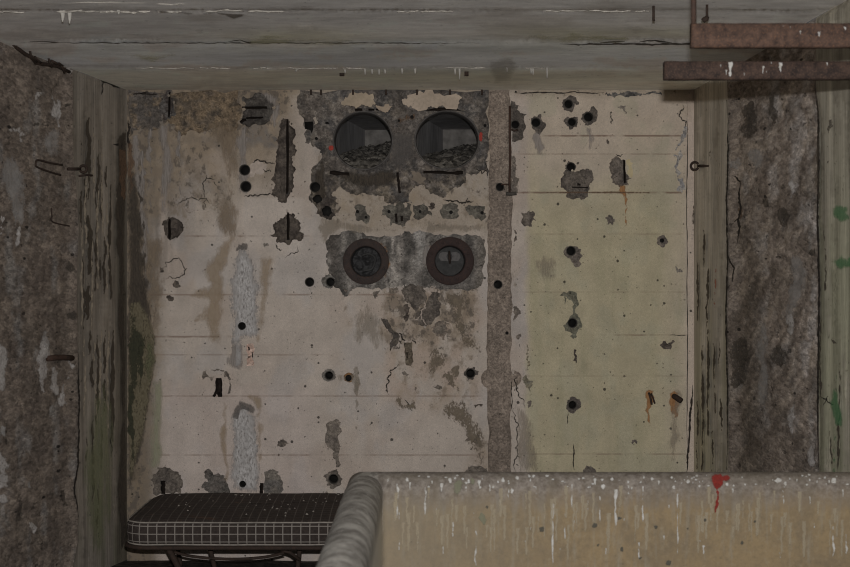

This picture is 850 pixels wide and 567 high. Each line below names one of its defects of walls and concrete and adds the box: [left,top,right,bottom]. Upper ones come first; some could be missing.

flaking render [162,217,184,241]
crack [180,175,217,206]
flaking render [239,90,490,340]
flaking render [561,161,594,200]
corrosion [547,186,649,223]
water stain [115,126,181,548]
flaking render [381,318,414,376]
crack [386,286,453,411]
flaking render [151,465,183,496]